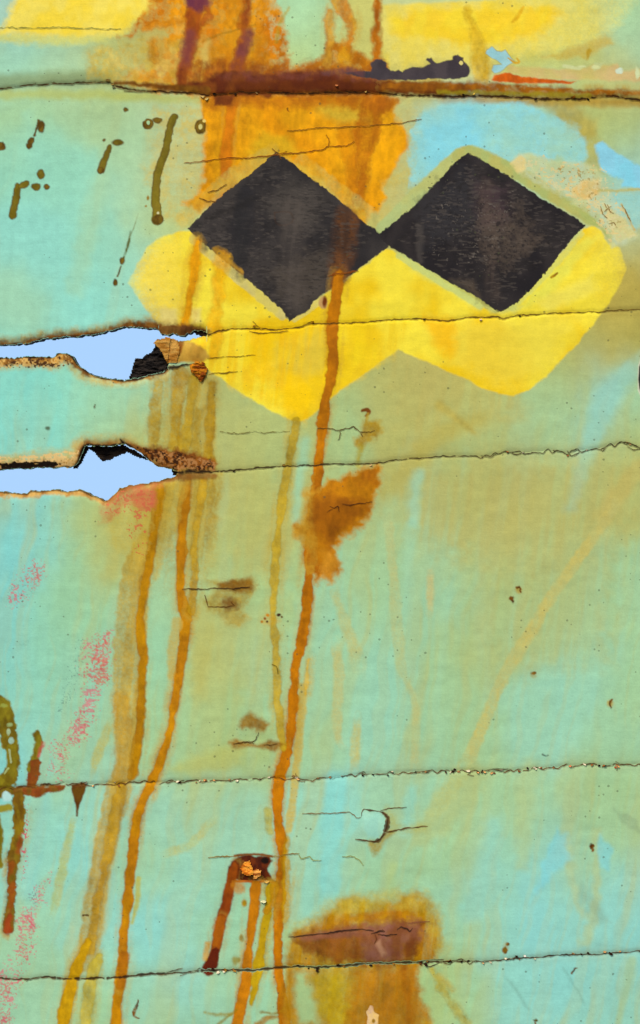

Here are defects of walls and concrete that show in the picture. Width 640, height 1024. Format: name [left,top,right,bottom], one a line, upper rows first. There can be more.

crack [0,79,640,203]
rust [80,0,640,364]
spalling [0,313,214,391]
crack [164,308,640,375]
crack [173,426,640,475]
spalling [0,428,220,556]
rust [49,264,474,1024]
crack [0,761,640,790]
crack [208,852,233,860]
crack [272,806,428,865]
crack [0,921,640,982]